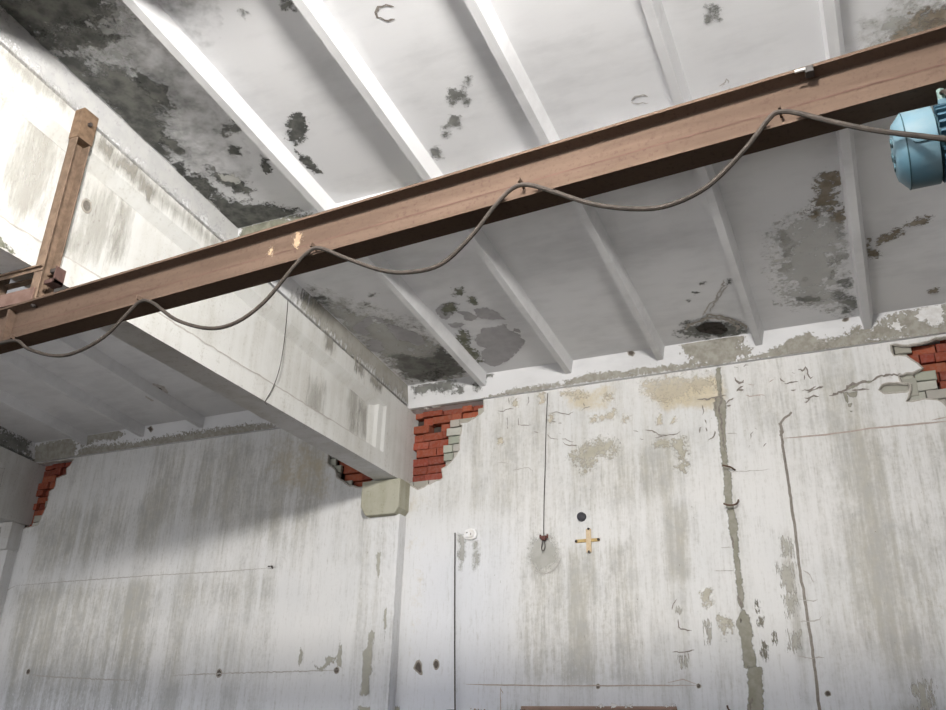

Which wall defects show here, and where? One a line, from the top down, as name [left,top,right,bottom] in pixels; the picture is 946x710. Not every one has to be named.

damp [0,0,313,240]
damp [285,112,323,174]
damp [806,170,846,224]
damp [297,293,494,403]
damp [441,287,477,316]
peeling [435,302,525,367]
damp [833,278,857,314]
flaking render [407,314,946,490]
peeling [23,422,277,529]
crack [637,364,946,710]
peeling [358,608,387,710]